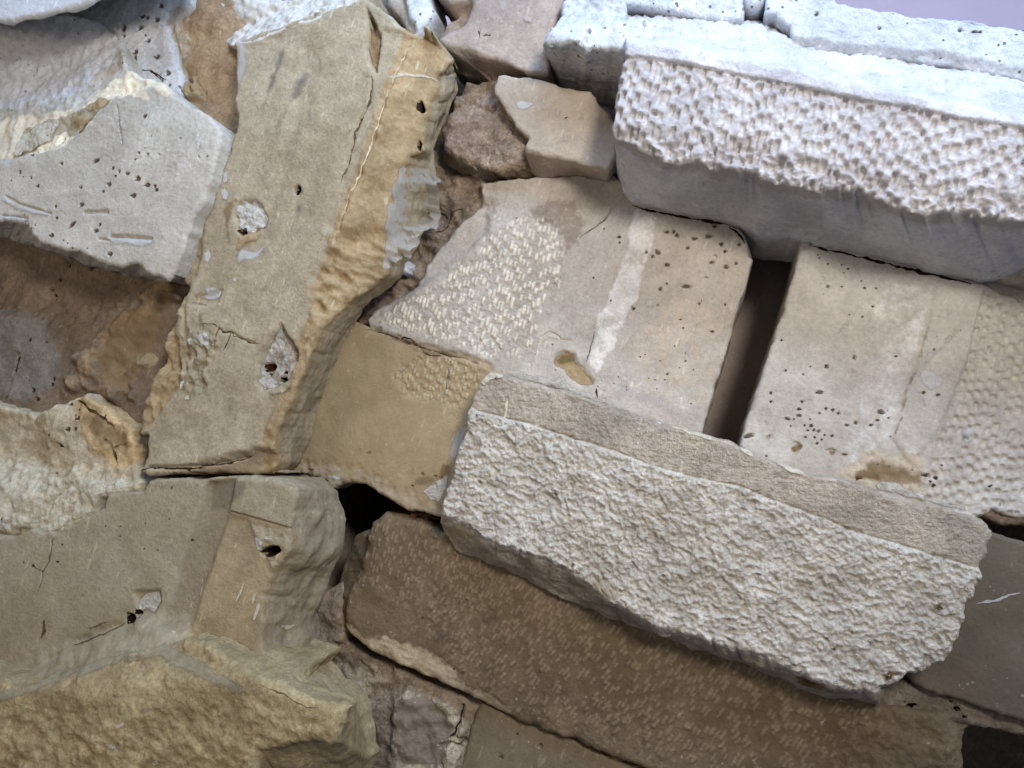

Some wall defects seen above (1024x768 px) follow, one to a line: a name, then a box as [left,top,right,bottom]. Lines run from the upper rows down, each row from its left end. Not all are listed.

spalling [221,172,268,262]
crack [196,323,257,349]
spalling [258,325,299,394]
crack [78,400,252,473]
damp [856,463,919,482]
spalling [135,591,161,618]